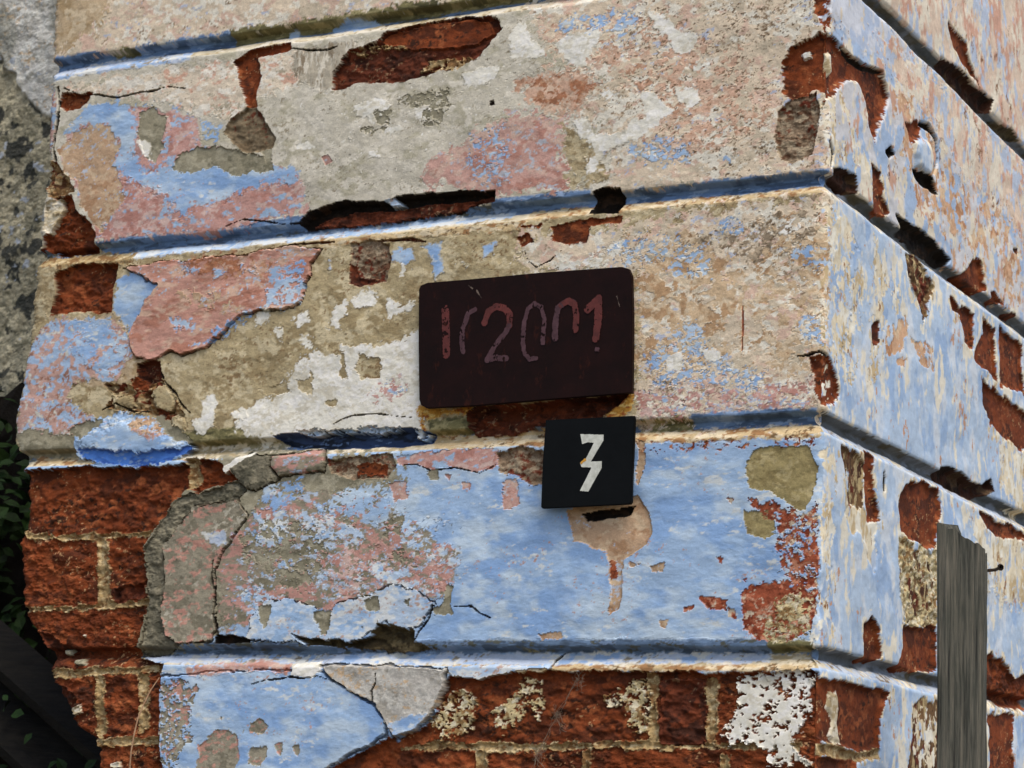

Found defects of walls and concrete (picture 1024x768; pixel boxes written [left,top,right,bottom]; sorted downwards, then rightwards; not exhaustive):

spalling [332,4,710,174]
spalling [774,0,890,164]
peeling [16,28,513,435]
hole [826,168,859,195]
flaking render [870,163,951,320]
spalling [947,257,1024,452]
crack [211,559,219,633]
flaking render [20,310,890,768]
spalling [852,466,994,673]
spalling [979,511,1024,541]
peeling [908,696,937,768]